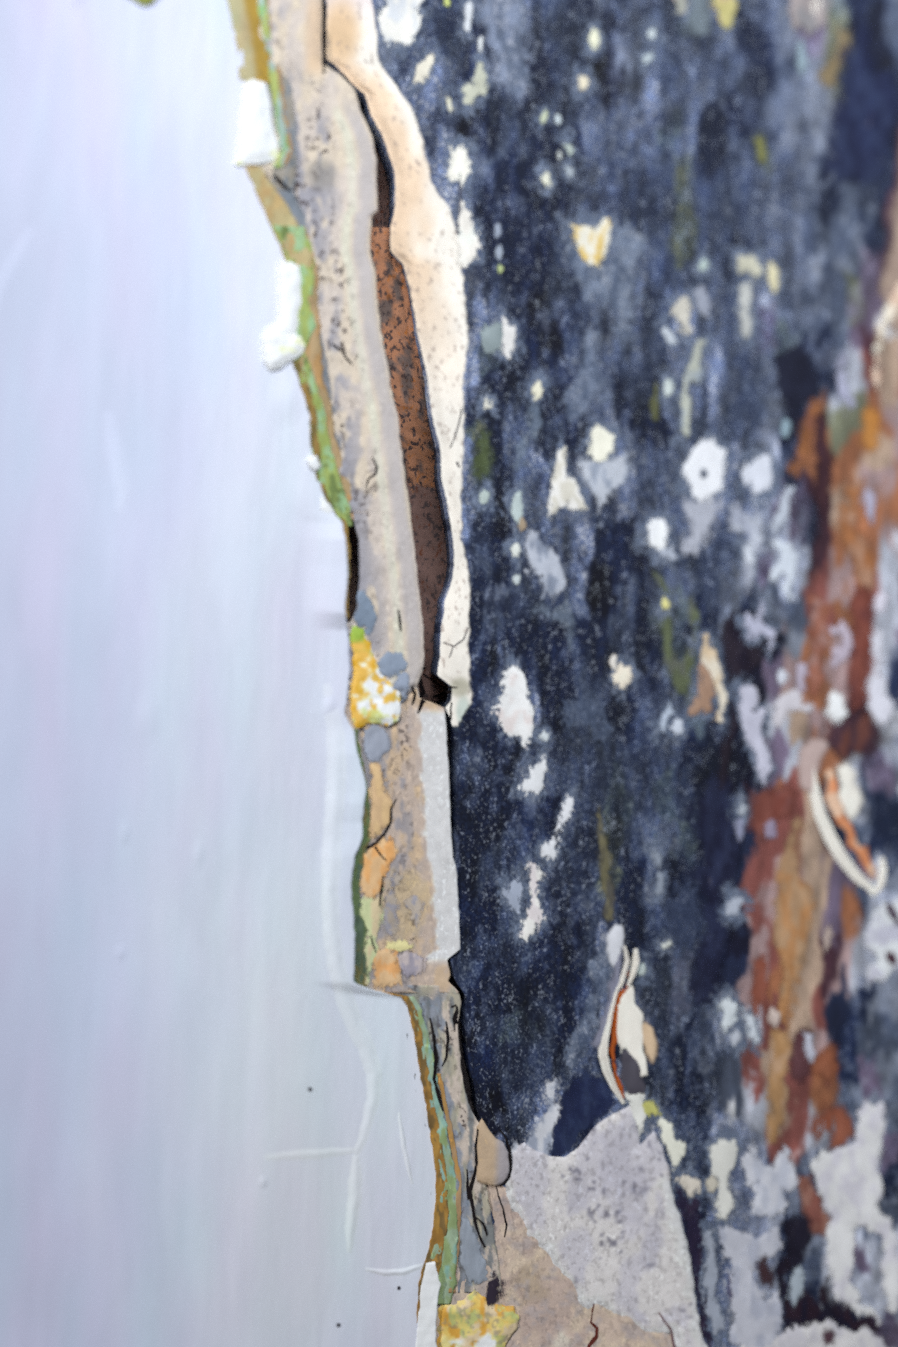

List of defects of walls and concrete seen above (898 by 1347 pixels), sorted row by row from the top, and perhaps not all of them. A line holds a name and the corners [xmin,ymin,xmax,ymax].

crack [332,343,353,365]
crack [365,144,468,797]
spalling [227,0,898,1347]
corrosion [718,250,898,1236]